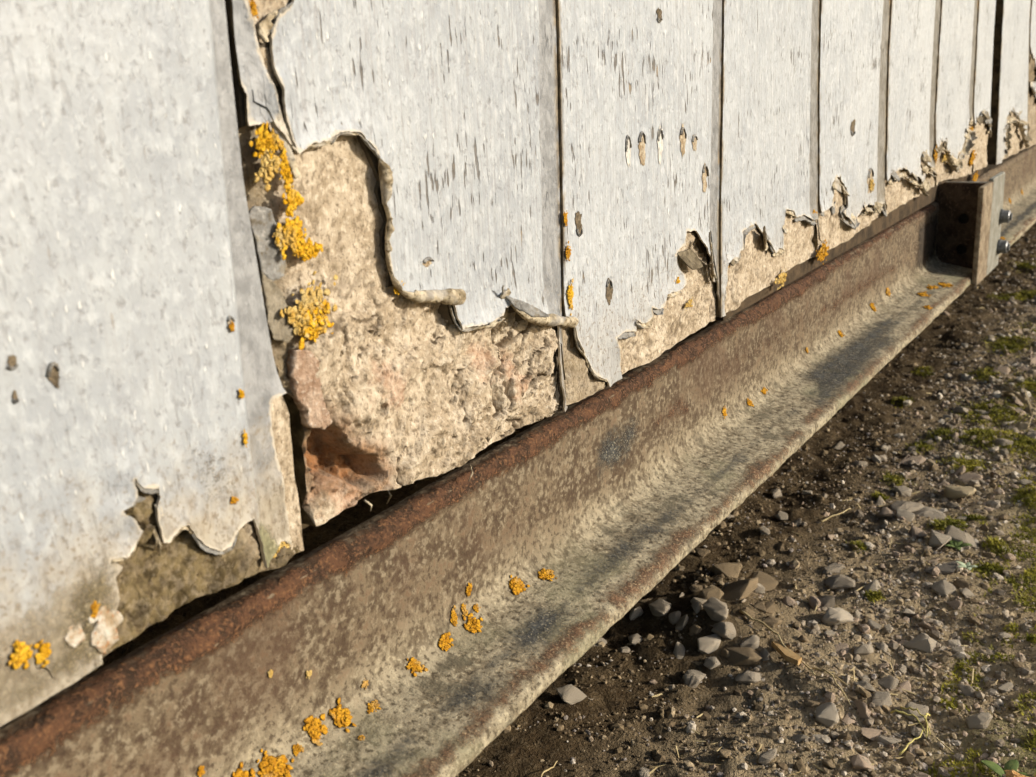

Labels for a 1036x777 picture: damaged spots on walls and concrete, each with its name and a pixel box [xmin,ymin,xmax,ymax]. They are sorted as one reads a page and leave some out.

peeling [248,0,293,94]
peeling [63,107,607,657]
corrosion [0,204,936,777]
peeling [617,52,1036,375]